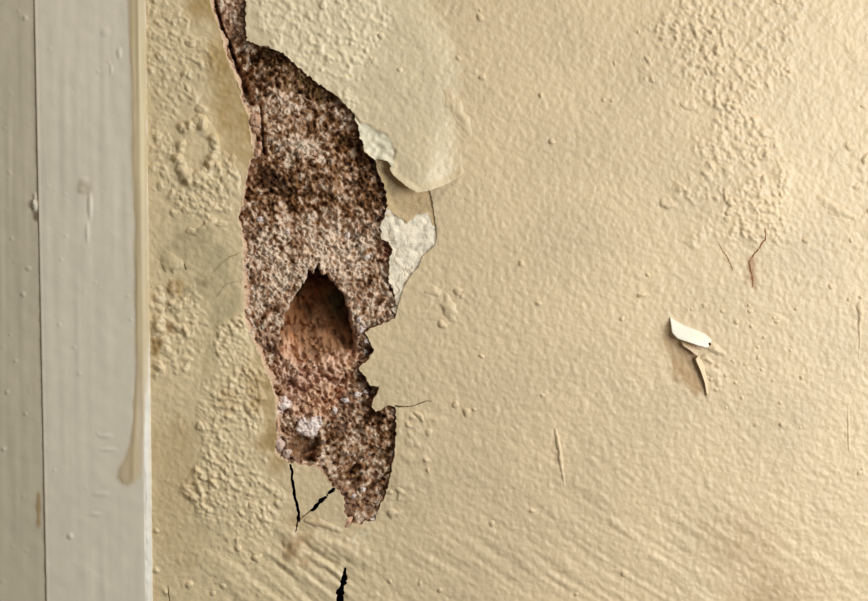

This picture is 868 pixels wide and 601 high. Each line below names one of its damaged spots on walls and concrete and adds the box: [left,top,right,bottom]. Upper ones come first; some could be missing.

flaking render [210,0,464,528]
peeling [670,317,735,398]
crack [288,461,338,532]
crack [336,567,348,601]